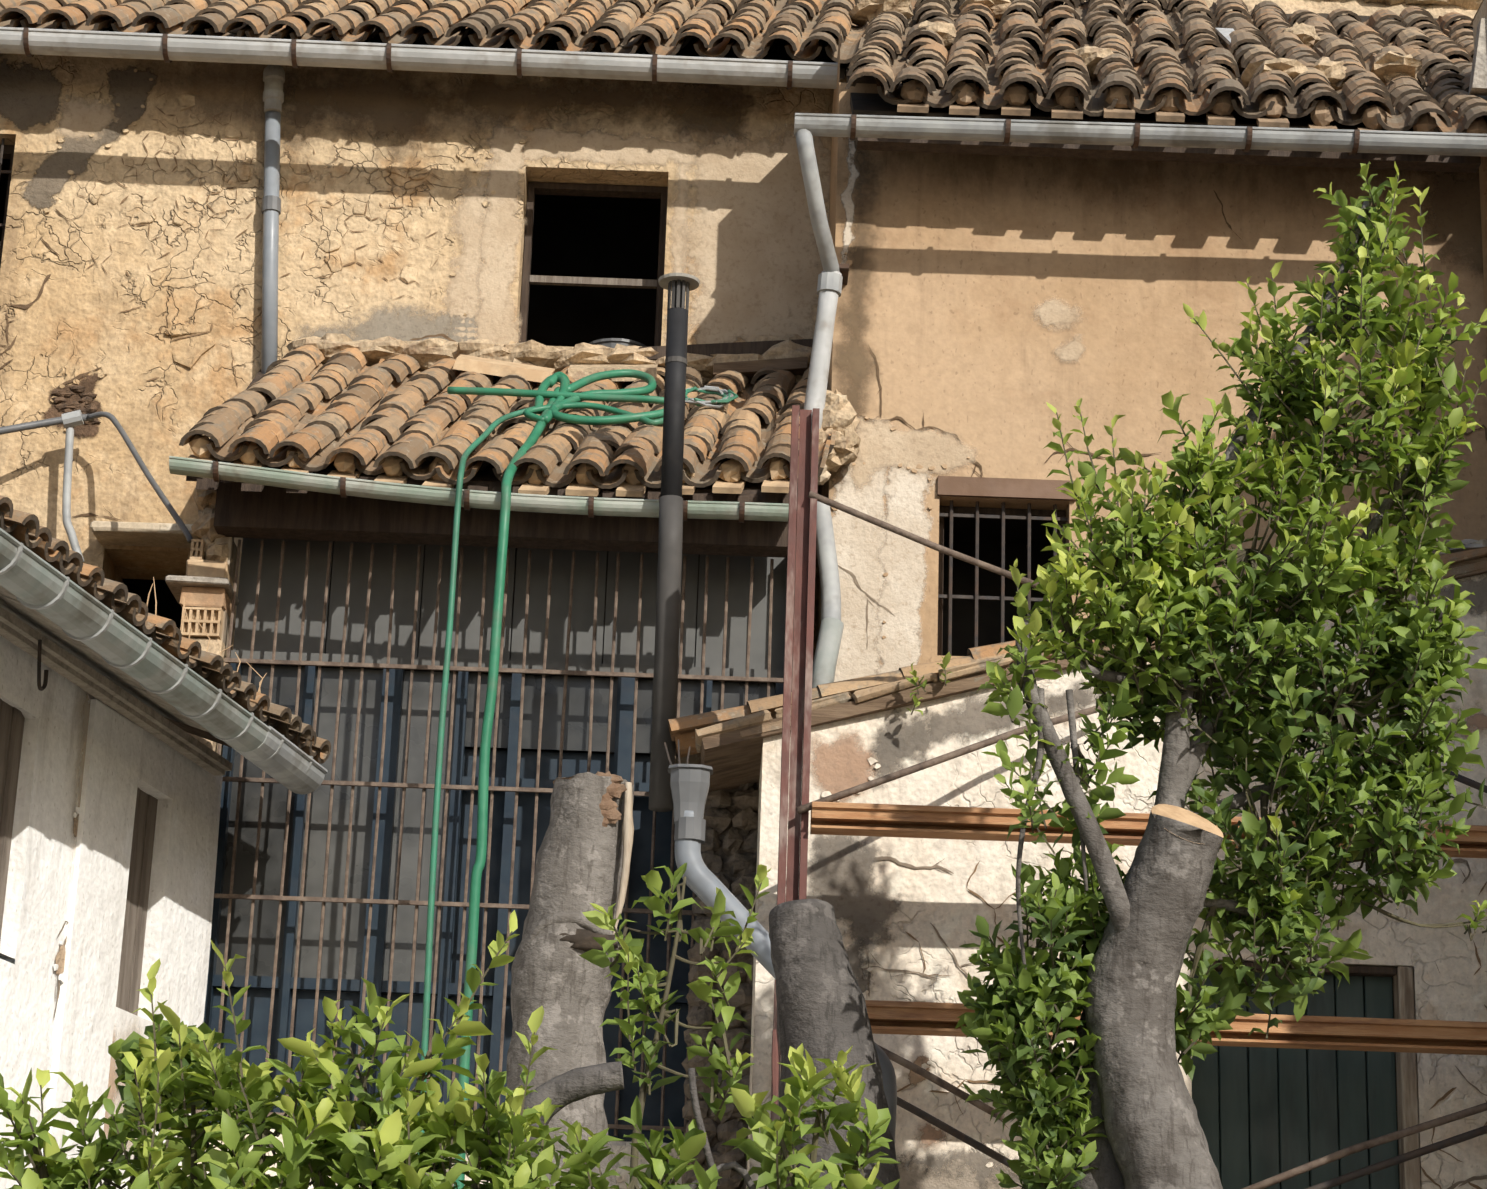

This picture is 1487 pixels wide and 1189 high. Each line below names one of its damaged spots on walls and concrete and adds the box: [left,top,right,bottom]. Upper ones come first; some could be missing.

peeling [0,59,157,213]
crack [0,92,255,389]
crack [279,127,494,300]
crack [410,334,456,342]
peeling [1035,300,1085,361]
peeling [818,389,976,682]
peeling [812,733,881,802]
damp [807,835,901,962]
crack [1442,857,1487,896]
crack [1435,940,1487,1009]
crack [1421,1066,1487,1189]